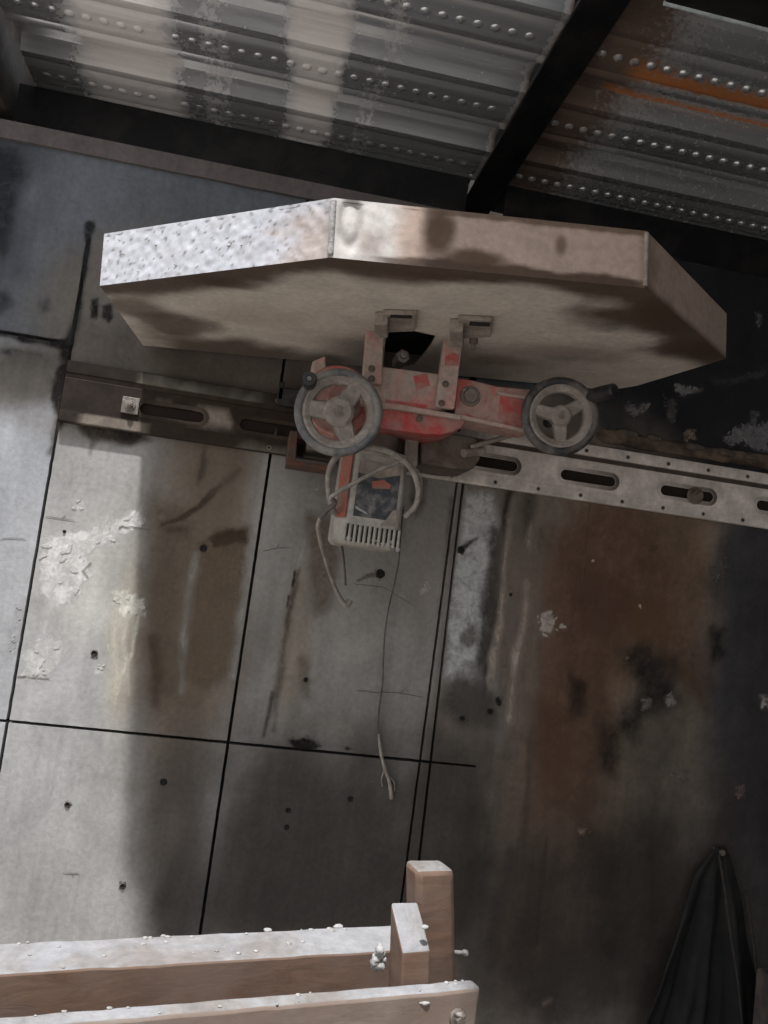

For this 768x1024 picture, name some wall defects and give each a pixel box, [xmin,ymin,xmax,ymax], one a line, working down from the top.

peeling [663,383,703,423]
peeling [724,411,768,452]
leakage [162,473,237,526]
peeling [10,510,146,679]
leakage [444,490,542,736]
peeling [537,610,566,637]